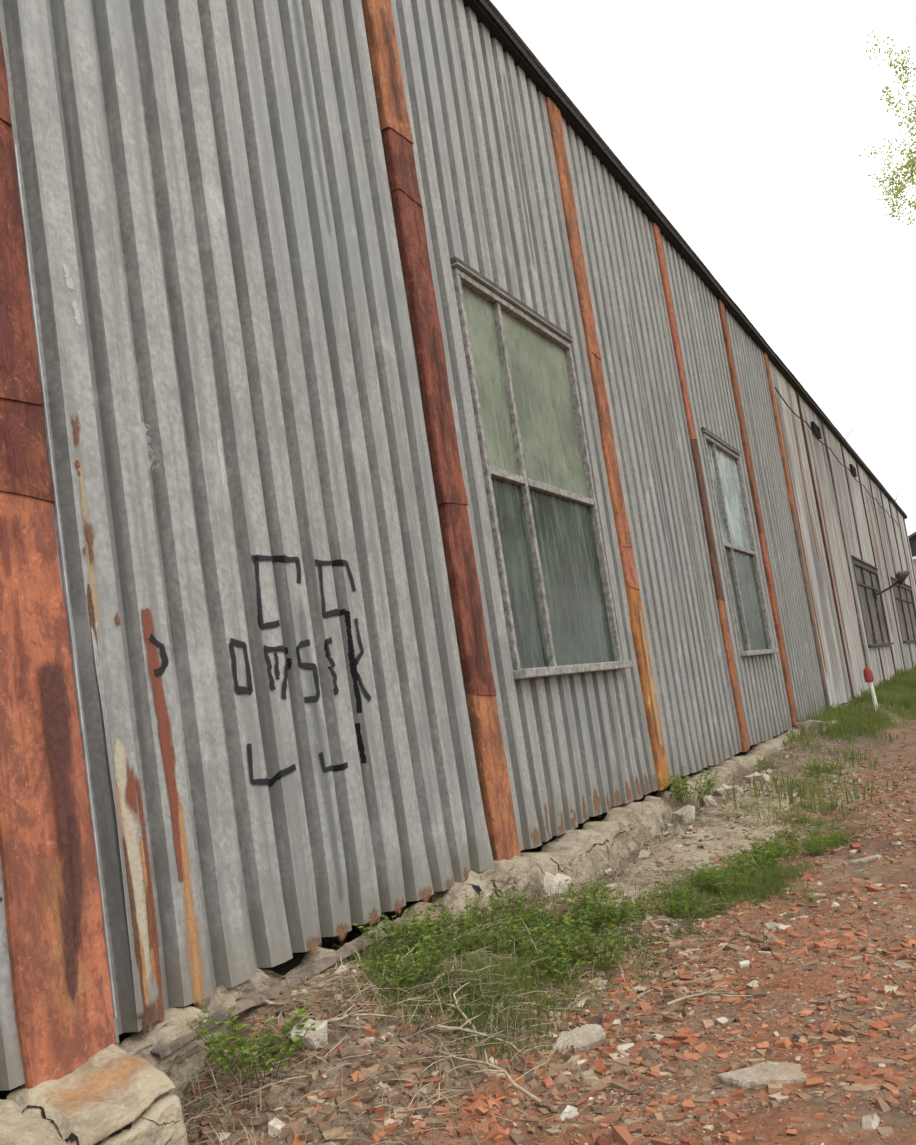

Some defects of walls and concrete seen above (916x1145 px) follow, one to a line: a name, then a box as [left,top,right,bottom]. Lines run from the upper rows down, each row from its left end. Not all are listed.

rust [72,416,81,444]
rust [75,460,99,654]
rust [142,609,204,1004]